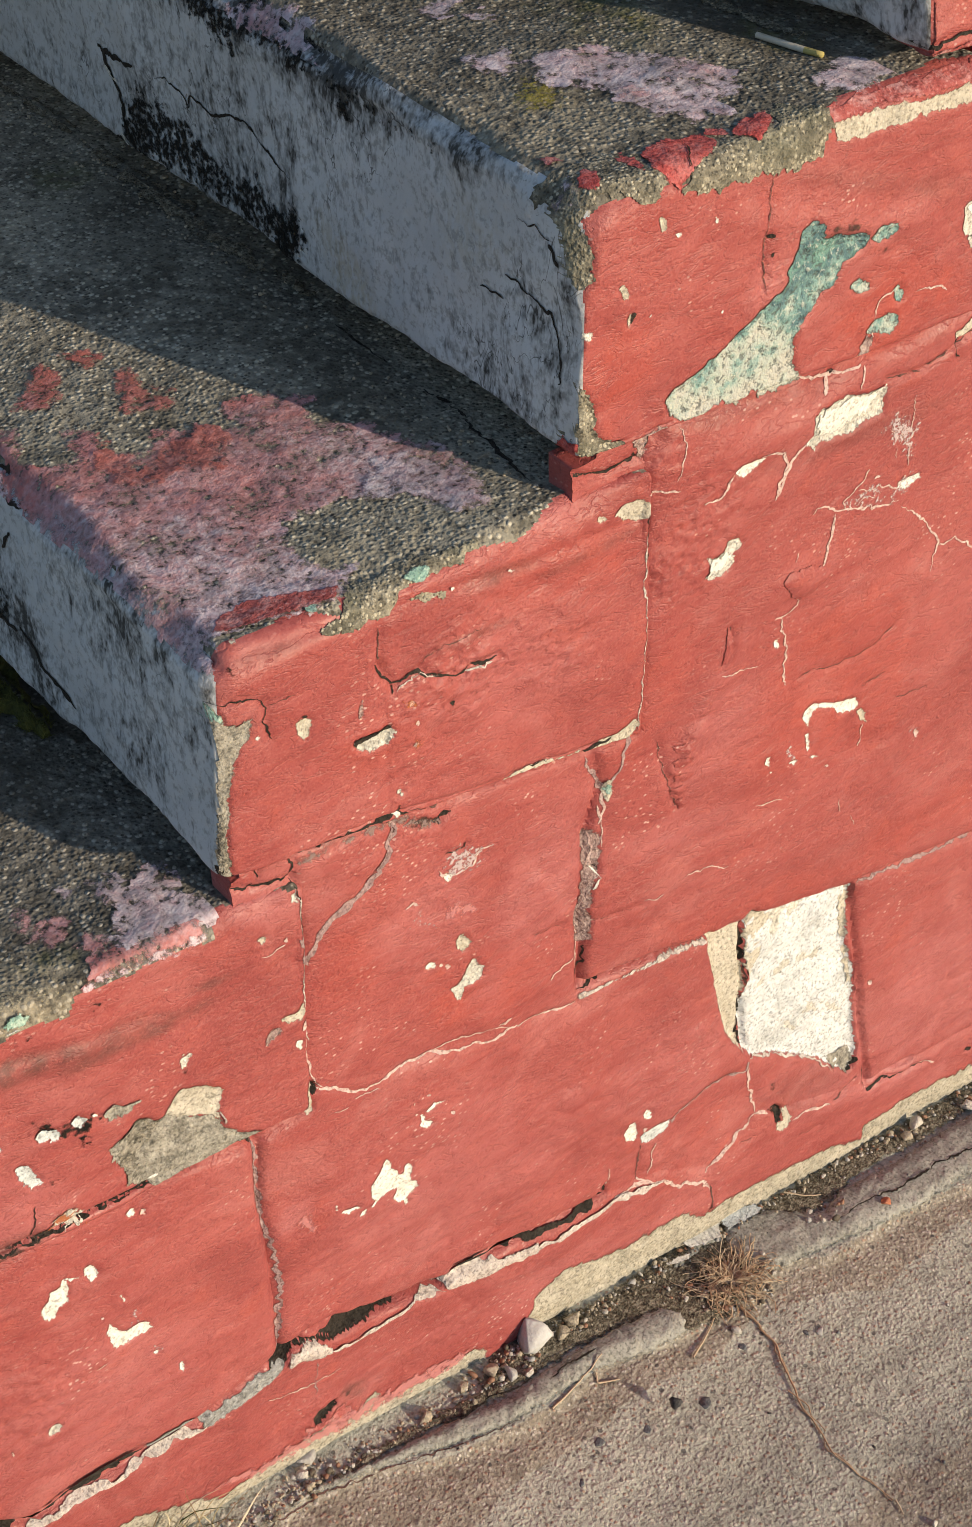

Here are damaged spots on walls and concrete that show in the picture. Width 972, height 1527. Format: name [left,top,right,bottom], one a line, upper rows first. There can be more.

peeling [460,44,972,291]
peeling [546,220,904,458]
peeling [0,348,490,676]
crack [902,507,972,571]
crack [203,695,294,741]
crack [375,628,497,694]
crack [214,789,451,981]
crack [307,733,726,1113]
peeling [704,832,968,1073]
spalling [32,1085,264,1186]
peeling [336,1160,418,1217]
crack [0,1047,972,1527]